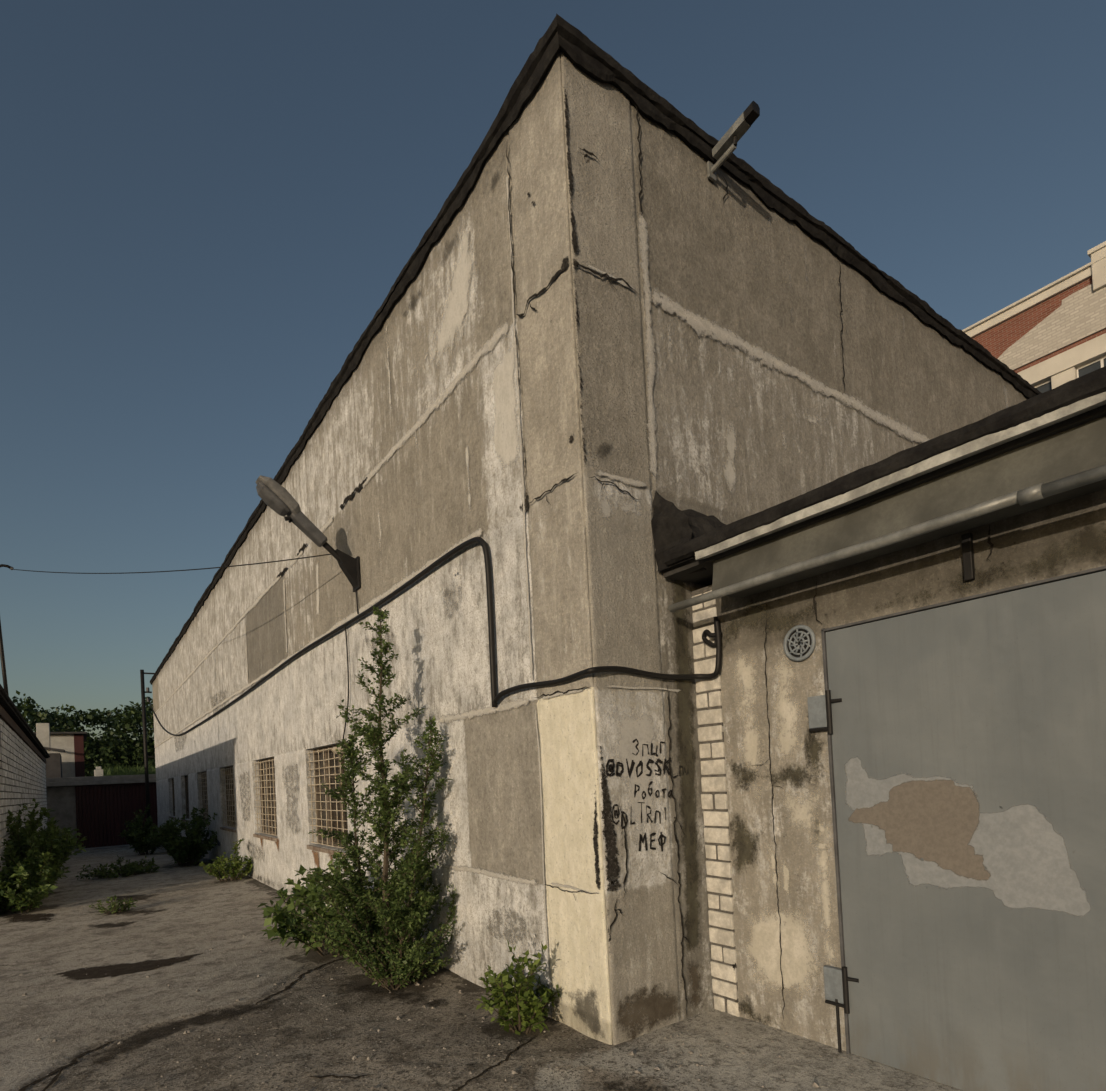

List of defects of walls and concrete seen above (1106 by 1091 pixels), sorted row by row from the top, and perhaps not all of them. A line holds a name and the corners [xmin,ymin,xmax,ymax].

crack [506,146,647,503]
crack [838,259,846,387]
leakage [1028,526,1106,575]
leakage [723,600,827,648]
leakage [672,580,701,951]
crack [752,615,785,1020]
leakage [730,652,835,997]
peeling [845,757,1091,916]
leakage [574,990,600,1034]
leakage [618,964,703,1039]
leakage [738,1000,769,1023]